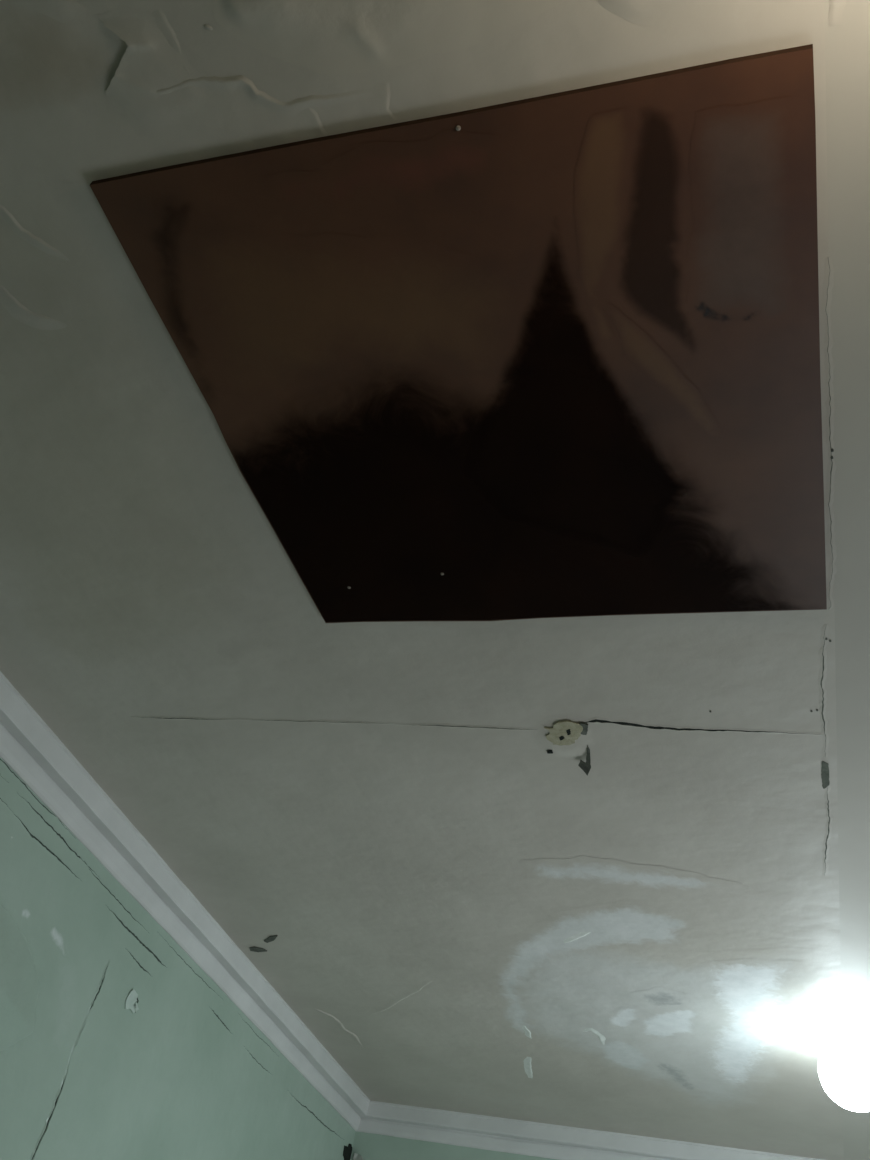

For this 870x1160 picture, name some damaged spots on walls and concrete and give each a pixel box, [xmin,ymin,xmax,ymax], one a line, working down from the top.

peeling [94,8,215,136]
crack [131,716,539,731]
crack [584,257,837,876]
crack [0,758,345,1160]